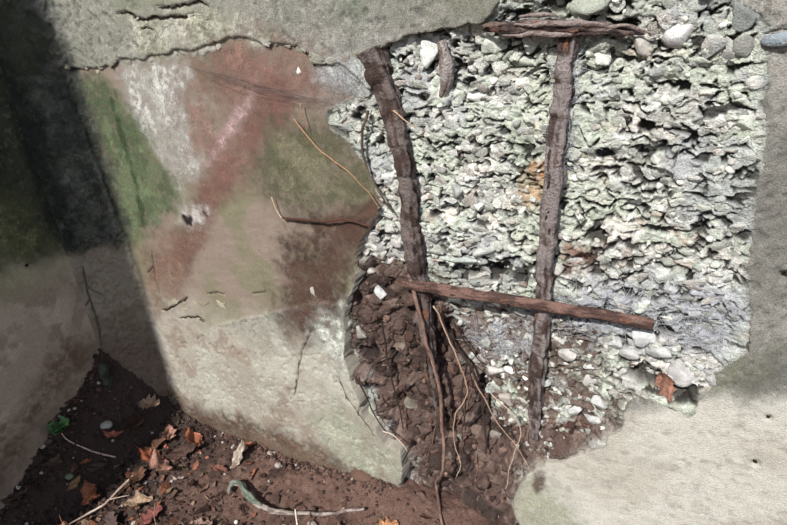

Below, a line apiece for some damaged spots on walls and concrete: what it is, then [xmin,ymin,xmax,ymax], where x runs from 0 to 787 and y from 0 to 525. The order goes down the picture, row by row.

crack [117,0,209,30]
damp [123,1,370,312]
rust [521,163,544,205]
spalling [258,0,779,525]
rust [563,244,589,267]
damp [316,318,348,373]
rust [545,344,591,403]